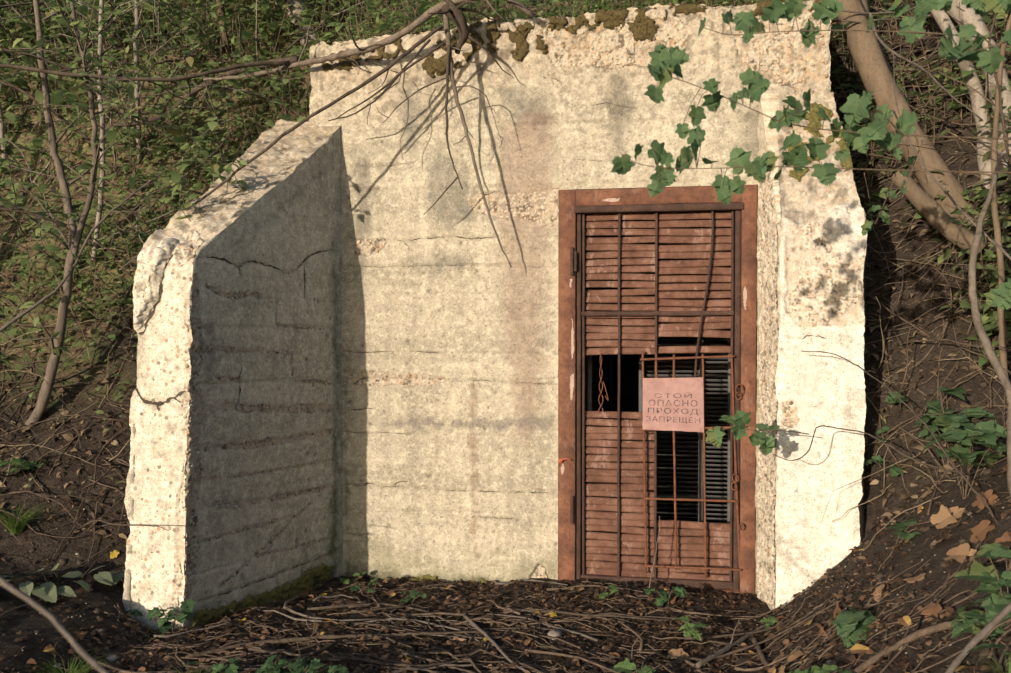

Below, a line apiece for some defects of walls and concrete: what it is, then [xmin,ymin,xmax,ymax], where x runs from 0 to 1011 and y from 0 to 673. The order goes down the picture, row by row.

spalling [466,188,559,227]
crack [139,238,327,335]
crack [135,388,190,411]